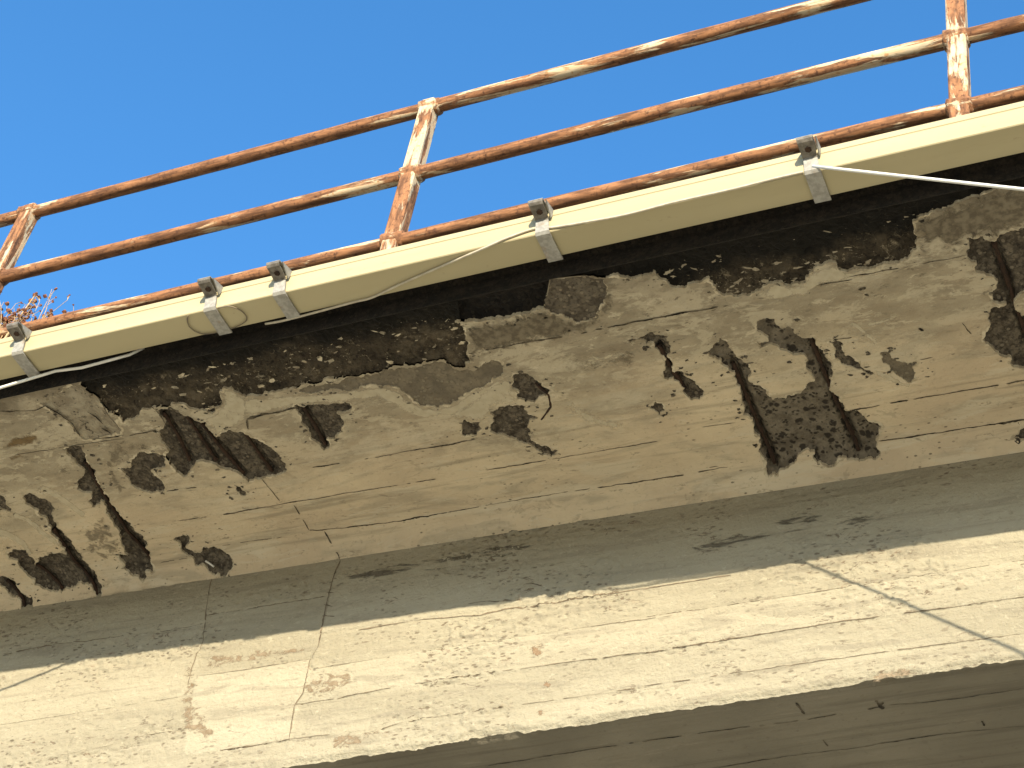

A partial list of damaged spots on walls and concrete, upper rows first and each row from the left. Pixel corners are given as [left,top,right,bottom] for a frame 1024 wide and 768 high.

spalling [0,491,105,609]
crack [366,439,474,459]
crack [4,462,1024,751]
spalling [37,177,1024,583]